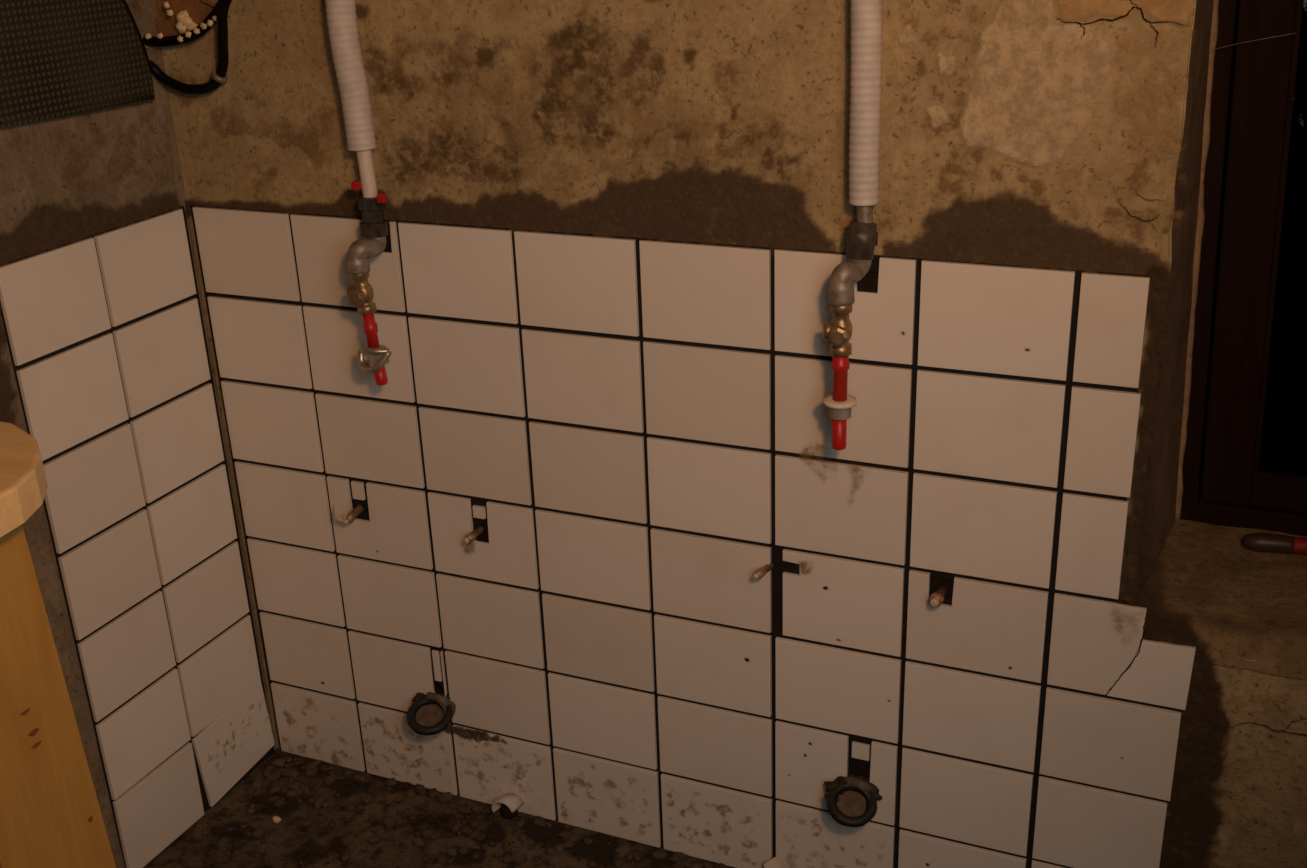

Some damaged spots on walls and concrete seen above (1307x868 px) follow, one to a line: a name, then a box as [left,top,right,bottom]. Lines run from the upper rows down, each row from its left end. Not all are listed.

water stain [356,5,368,18]
crack [1057,0,1183,44]
water stain [366,40,504,96]
water stain [533,14,664,144]
crack [1108,619,1146,692]